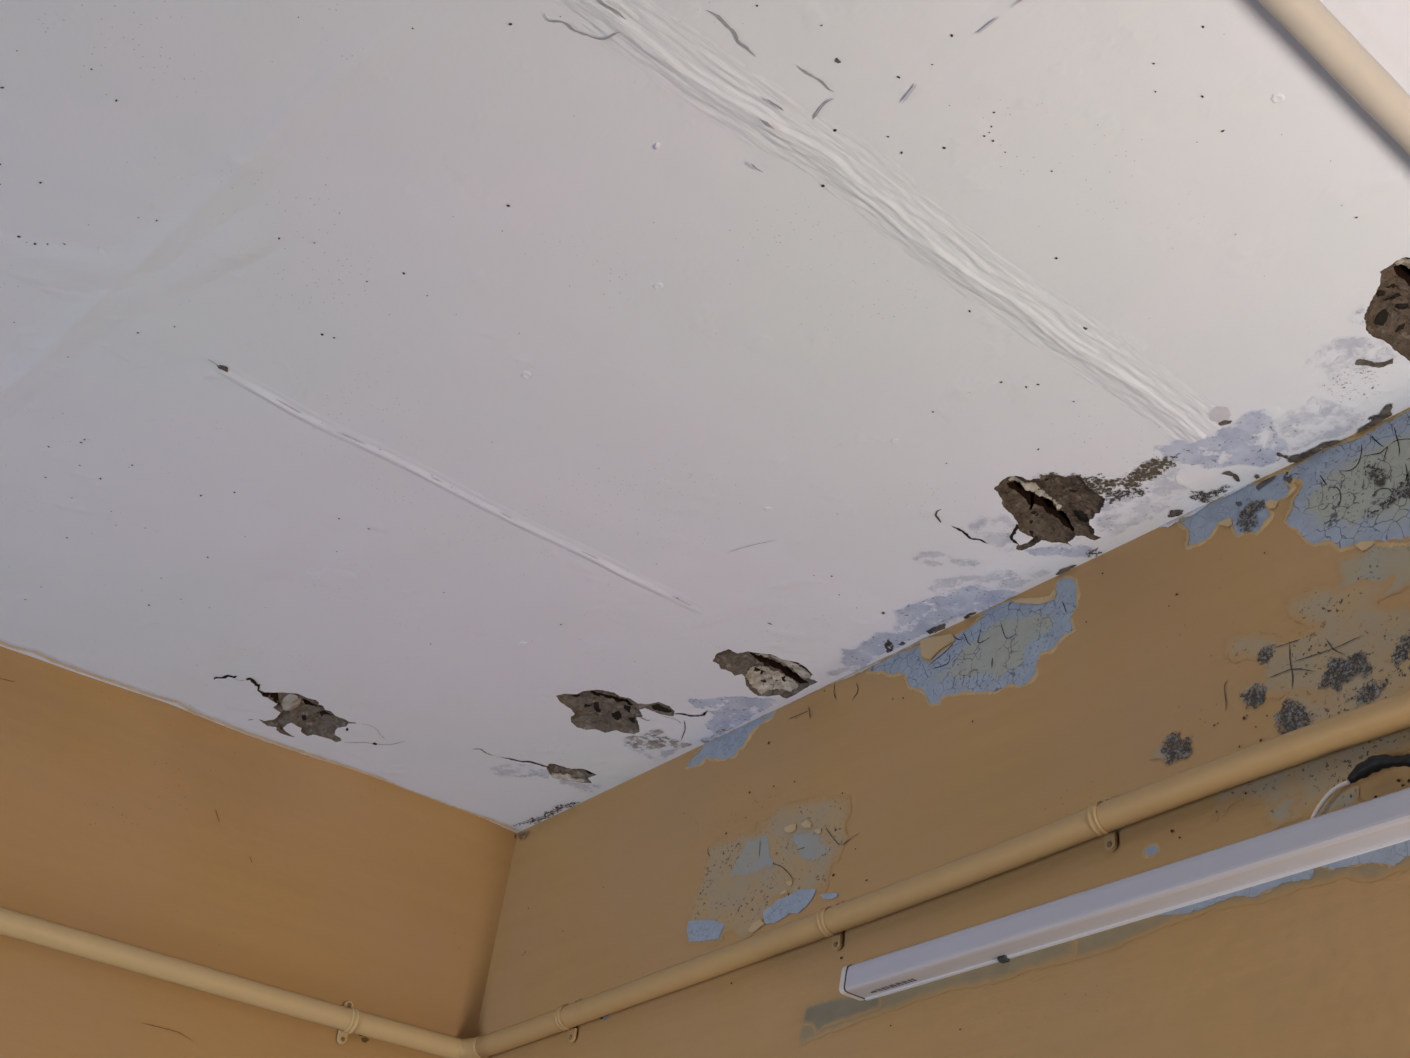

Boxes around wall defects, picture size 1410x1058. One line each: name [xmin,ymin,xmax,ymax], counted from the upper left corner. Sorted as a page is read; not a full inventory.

spalling [1363,257,1410,361]
spalling [935,475,1105,552]
peeling [1176,403,1410,742]
peeling [865,574,1087,707]
spalling [214,675,400,745]
spalling [480,749,596,783]
spalling [556,649,825,770]
water stain [1149,731,1193,764]
water stain [1239,683,1267,710]
water stain [1273,697,1315,734]
water stain [1314,650,1392,709]
peeling [684,792,859,949]